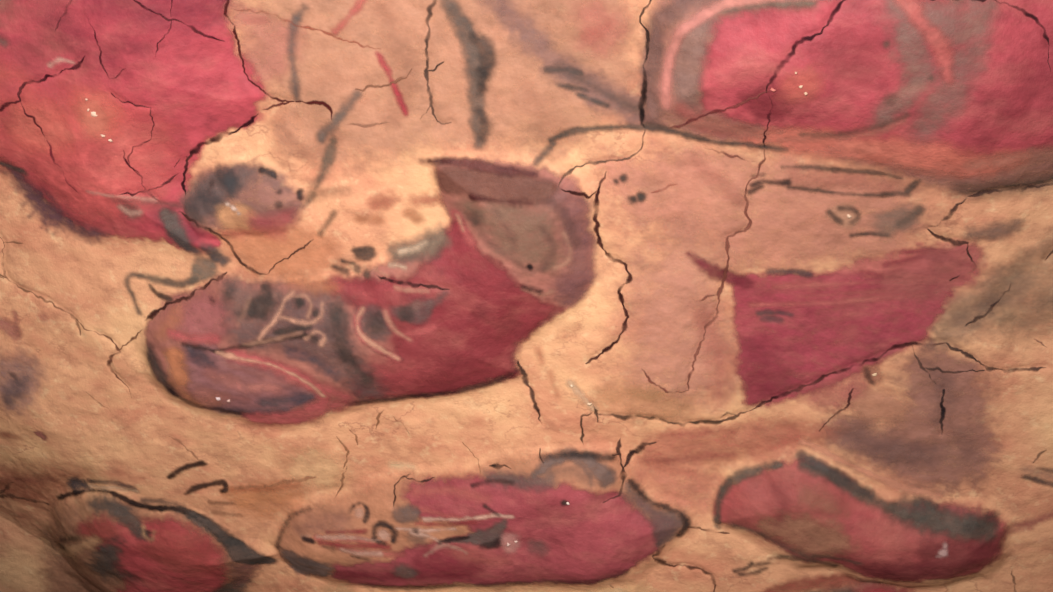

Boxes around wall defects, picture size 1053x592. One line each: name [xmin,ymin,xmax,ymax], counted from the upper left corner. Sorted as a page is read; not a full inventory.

crack [355,4,451,124]
crack [673,0,845,128]
crack [0,0,388,398]
crack [559,0,651,364]
crack [642,120,770,393]
crack [927,184,1048,281]
crack [580,290,1046,503]